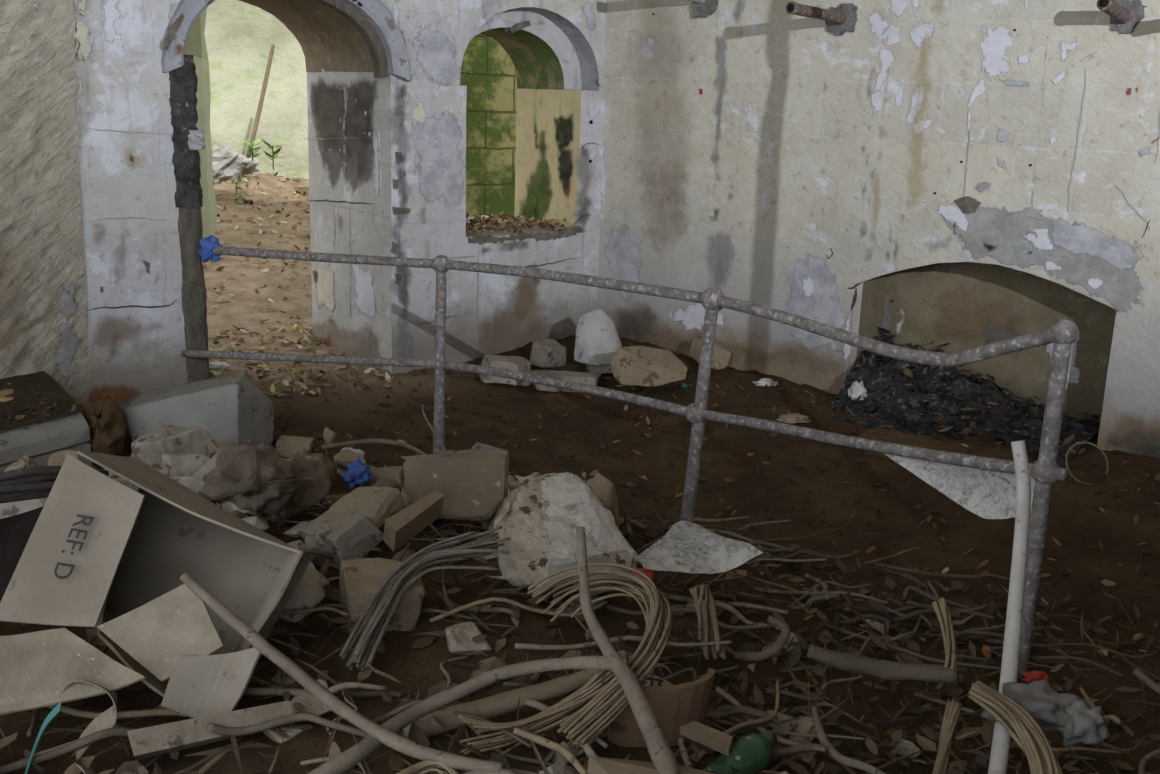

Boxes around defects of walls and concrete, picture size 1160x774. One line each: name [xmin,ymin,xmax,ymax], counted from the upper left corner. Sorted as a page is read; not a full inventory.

flaking render [163,3,184,51]
peeling [364,108,398,196]
peeling [392,2,469,215]
flaking render [509,21,531,34]
peeling [865,0,953,136]
flaking render [935,23,1147,318]